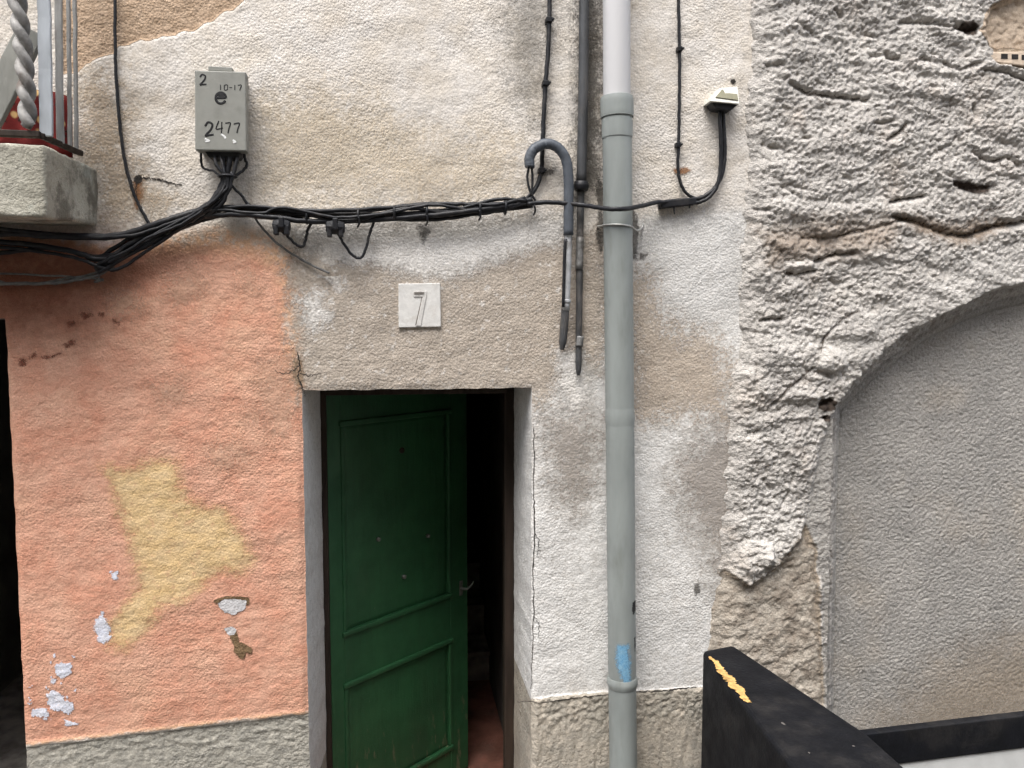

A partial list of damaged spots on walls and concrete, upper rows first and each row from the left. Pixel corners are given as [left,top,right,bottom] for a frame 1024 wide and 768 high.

peeling [958,0,1024,60]
crack [276,352,320,396]
peeling [93,459,254,648]
crack [521,428,607,703]
flaking render [214,596,252,659]
peeling [707,531,825,705]
peeling [28,653,79,726]
crack [636,685,693,693]